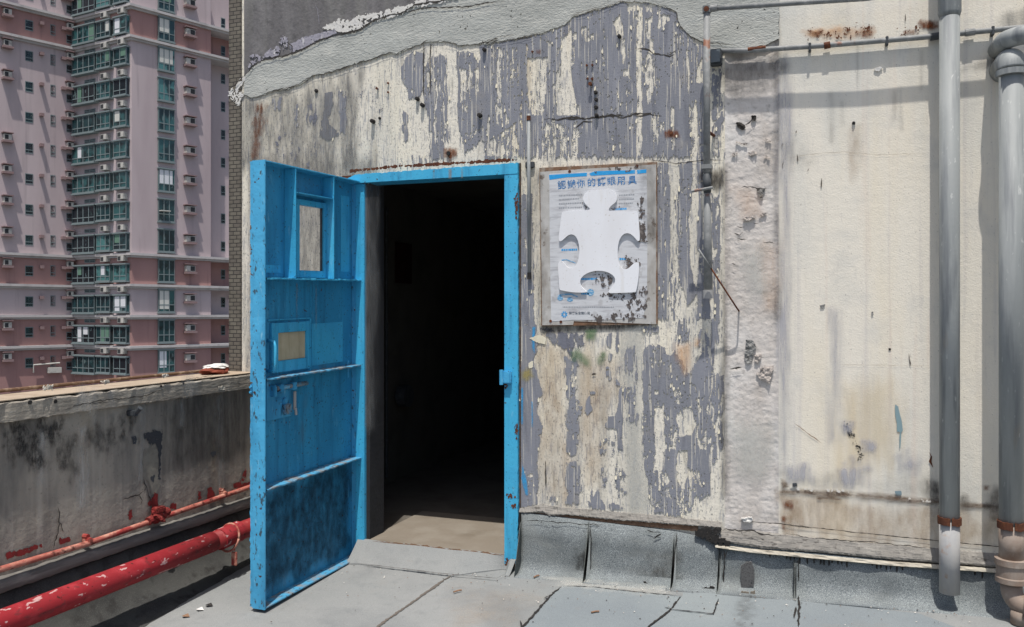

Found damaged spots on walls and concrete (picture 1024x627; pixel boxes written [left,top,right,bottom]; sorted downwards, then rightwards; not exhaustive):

peeling [228,0,450,106]
corrosion [805,22,875,41]
corrosion [897,21,938,36]
peeling [270,88,384,170]
crack [548,112,658,128]
corrosion [342,148,517,178]
peeling [399,2,756,517]
spalling [744,340,774,384]
mould [5,418,58,465]
peeling [131,430,163,482]